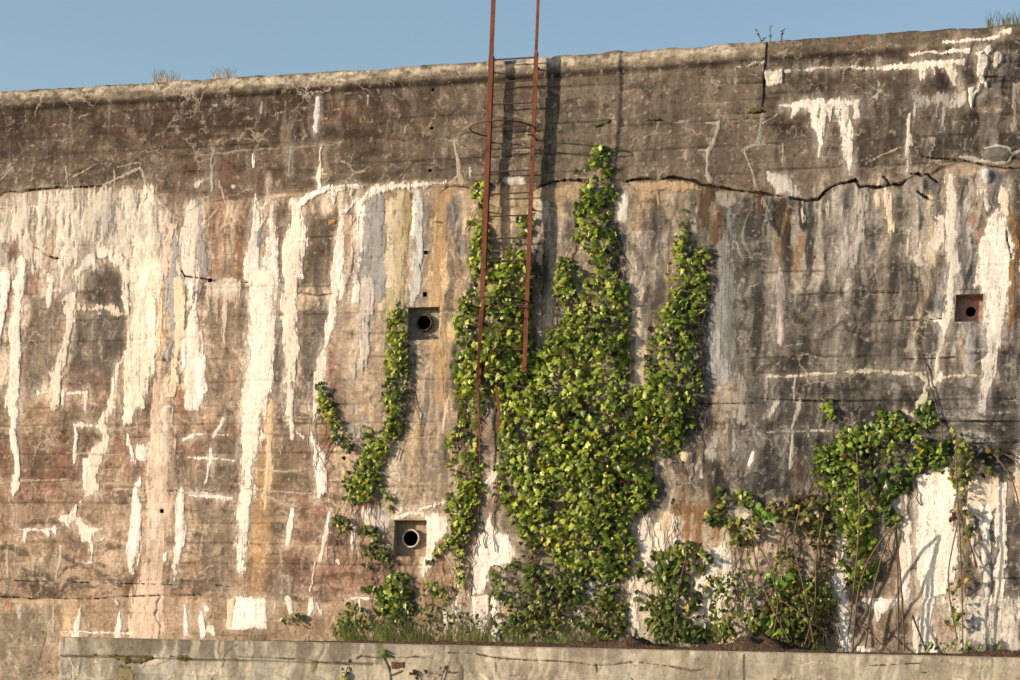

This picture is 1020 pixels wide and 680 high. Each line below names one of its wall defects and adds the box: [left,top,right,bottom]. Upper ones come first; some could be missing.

crack [1,185,109,209]
crack [534,178,584,191]
crack [621,156,1020,202]
water stain [703,28,1020,469]
water stain [680,437,719,479]
water stain [575,517,733,631]
water stain [833,497,874,652]
water stain [862,444,1020,680]
water stain [59,656,107,680]
water stain [139,654,174,668]